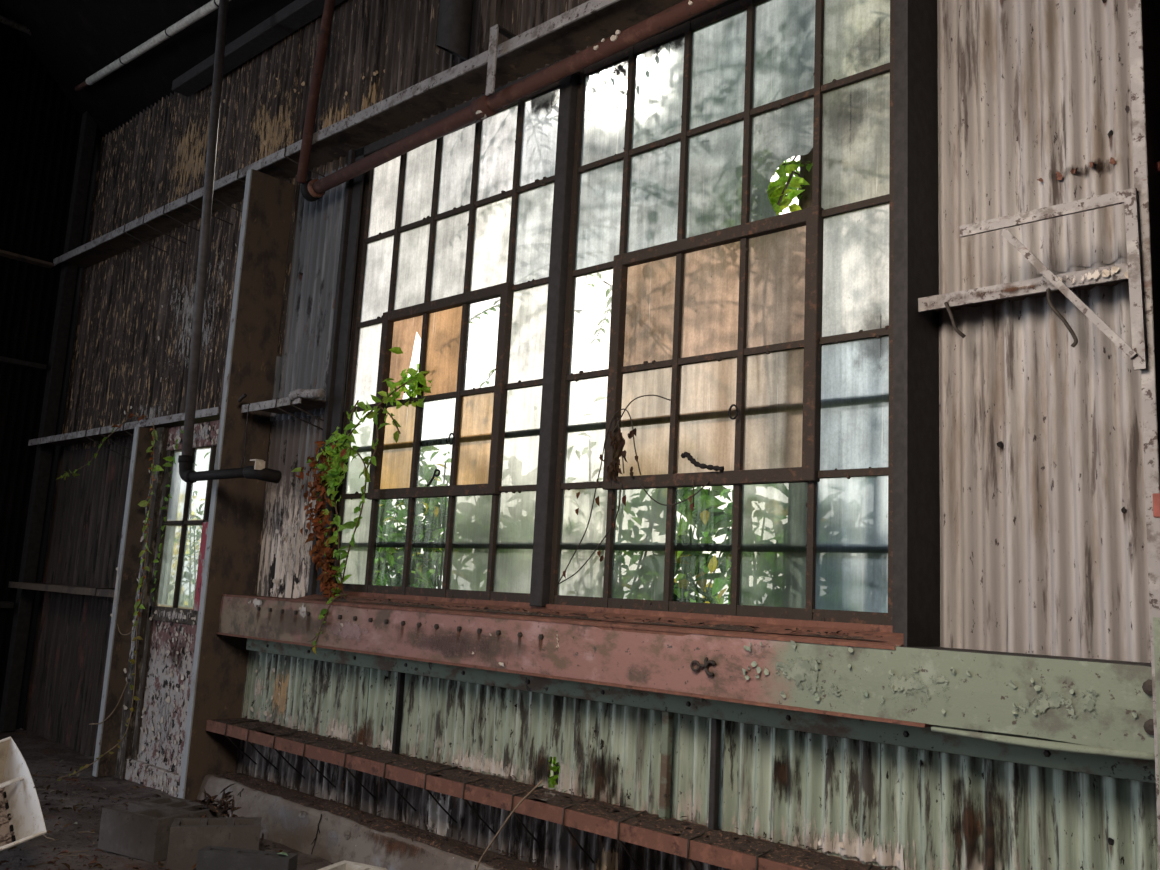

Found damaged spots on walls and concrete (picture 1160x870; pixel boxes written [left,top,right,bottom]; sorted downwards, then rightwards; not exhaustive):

peeling [272,502,313,590]